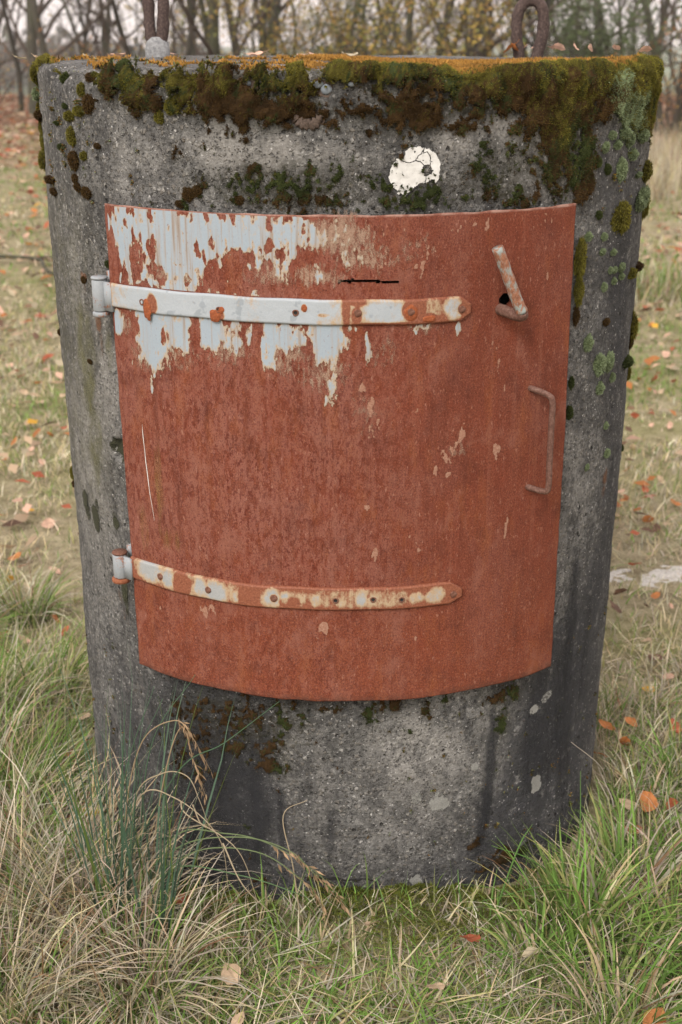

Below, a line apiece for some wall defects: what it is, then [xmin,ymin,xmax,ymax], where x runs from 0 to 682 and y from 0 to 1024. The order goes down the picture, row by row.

peeling [107,206,389,296]
peeling [409,242,436,279]
rust [143,299,151,321]
rust [210,307,224,322]
peeling [114,308,372,407]
damp [528,669,570,777]
damp [479,714,495,831]